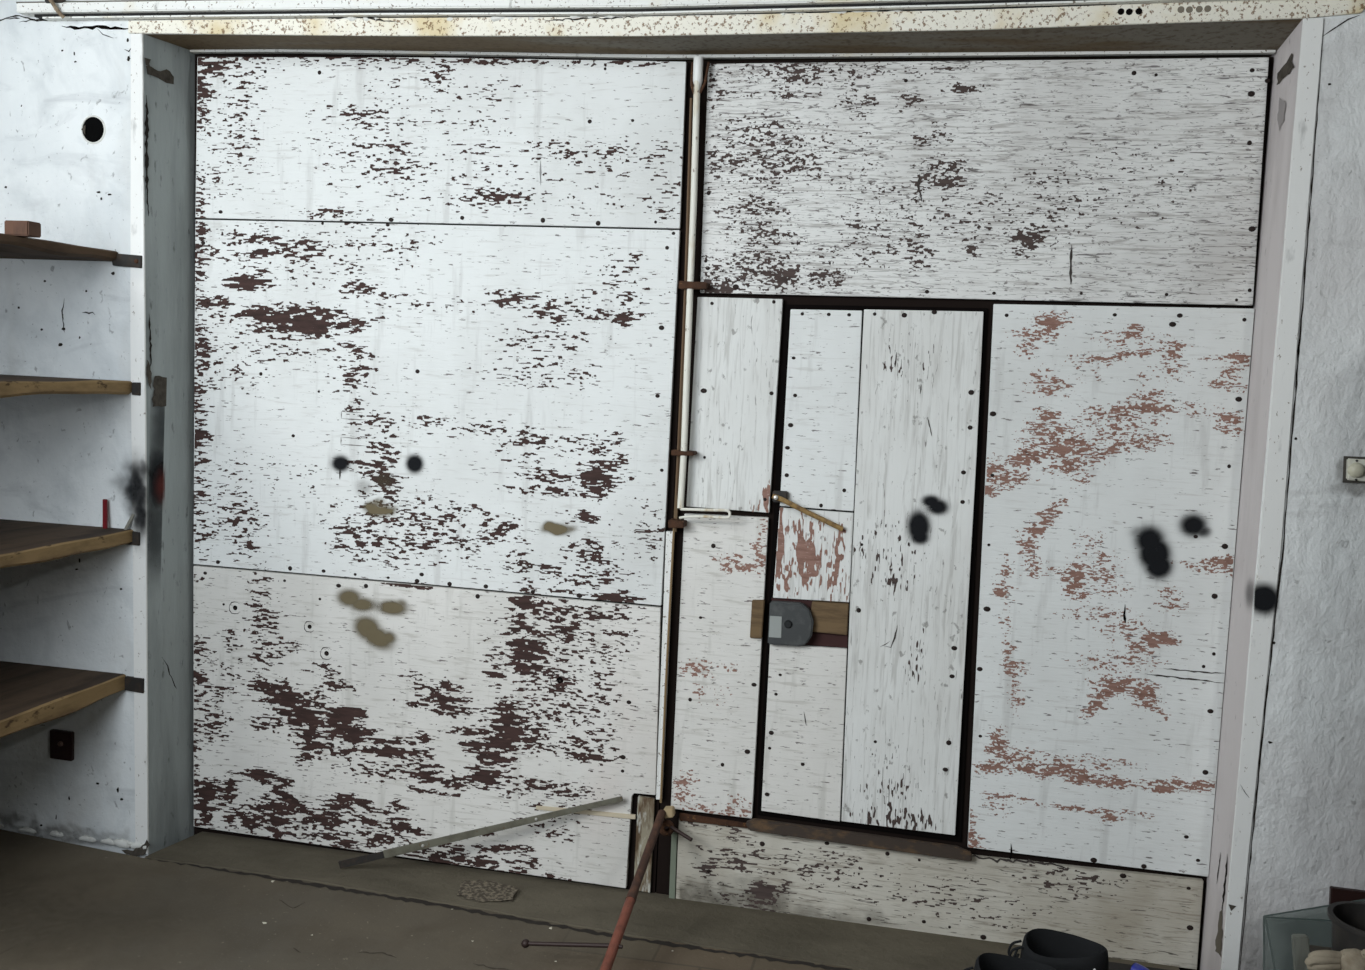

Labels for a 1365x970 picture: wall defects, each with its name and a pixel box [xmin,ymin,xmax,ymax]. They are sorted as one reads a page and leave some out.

crack [0,15,131,59]
peeling [701,62,1195,294]
peeling [193,57,682,881]
peeling [972,311,1251,796]
peeling [673,770,1155,929]